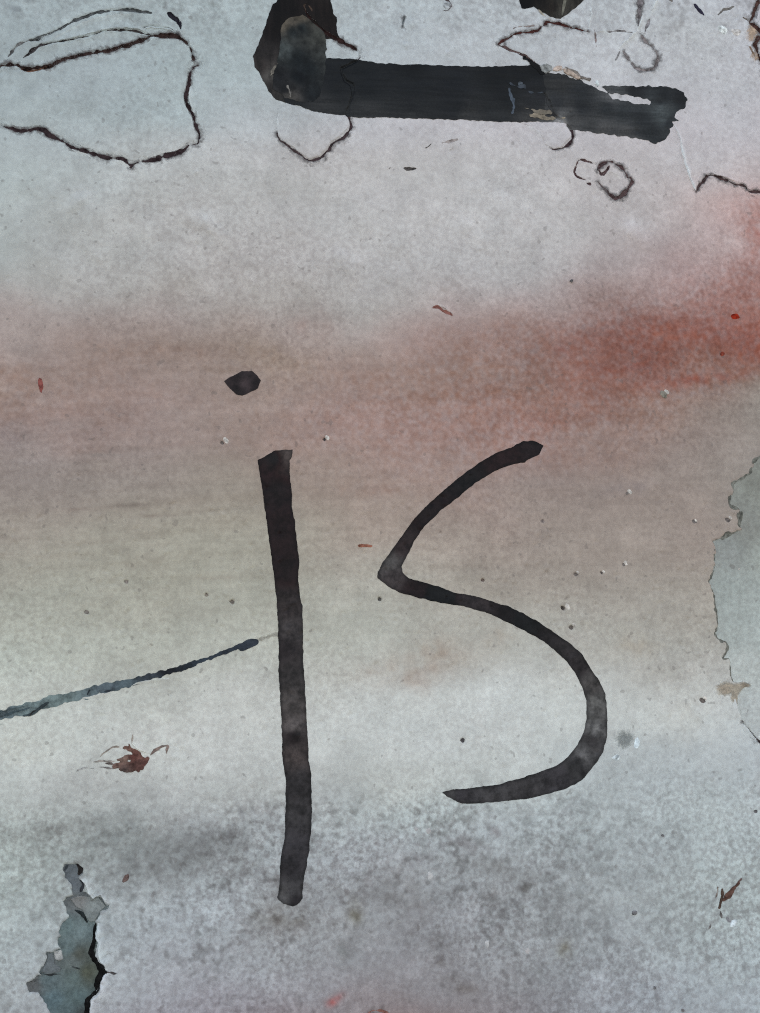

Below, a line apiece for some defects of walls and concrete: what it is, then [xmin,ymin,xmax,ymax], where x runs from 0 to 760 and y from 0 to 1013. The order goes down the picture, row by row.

crack [496,0,662,73]
crack [718,0,760,61]
crack [0,8,202,169]
crack [275,104,353,162]
crack [525,125,635,201]
crack [674,124,760,200]
peeling [708,456,760,741]
peeling [26,864,119,1013]